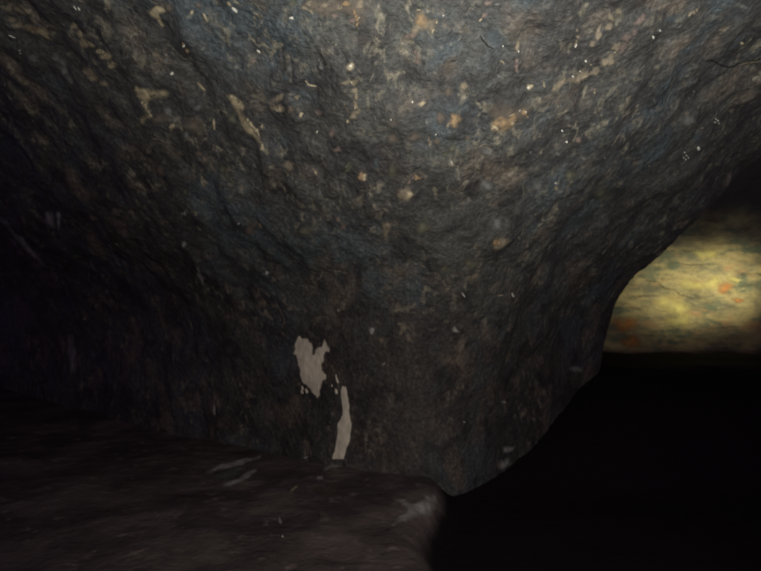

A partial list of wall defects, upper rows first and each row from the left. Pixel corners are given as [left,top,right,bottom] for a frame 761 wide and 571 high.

peeling [294,336,352,459]